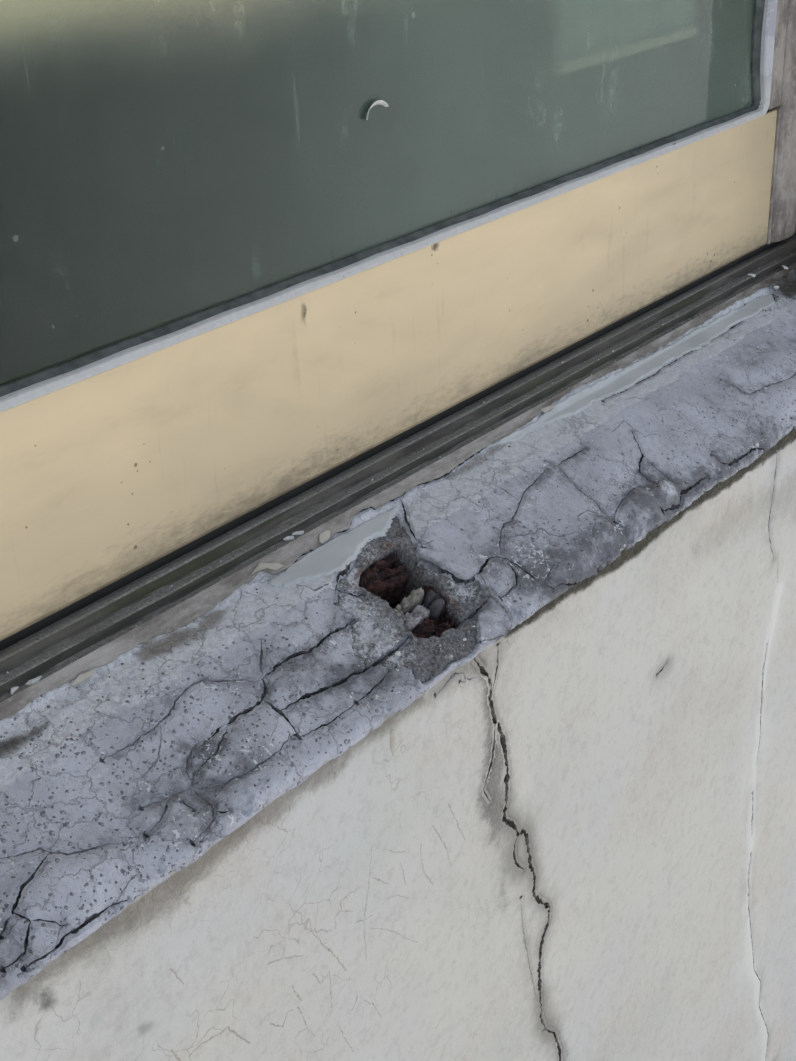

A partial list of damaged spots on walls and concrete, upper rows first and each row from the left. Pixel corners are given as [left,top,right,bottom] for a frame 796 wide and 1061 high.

crack [721,371,796,396]
spalling [251,505,484,684]
crack [0,294,779,1061]